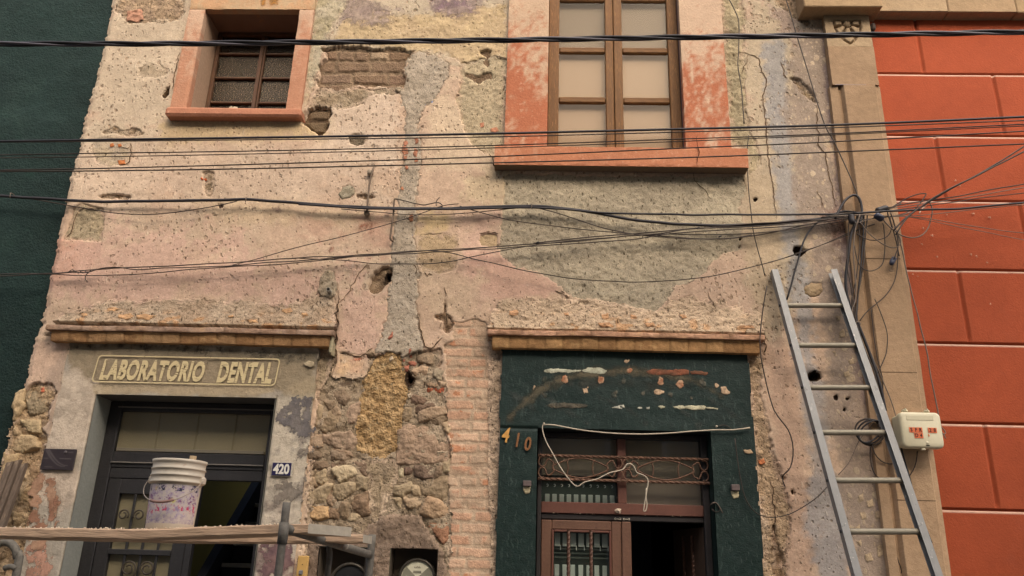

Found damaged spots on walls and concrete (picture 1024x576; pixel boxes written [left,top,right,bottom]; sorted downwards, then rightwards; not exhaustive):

flaking render [317,47,411,93]
crack [740,52,796,217]
crack [816,105,836,205]
crack [332,264,373,375]
spalling [369,268,393,294]
spalling [435,310,454,333]
peeling [641,377,693,399]
spalling [699,378,730,394]
flaking render [0,383,61,576]
flaking render [272,348,454,576]